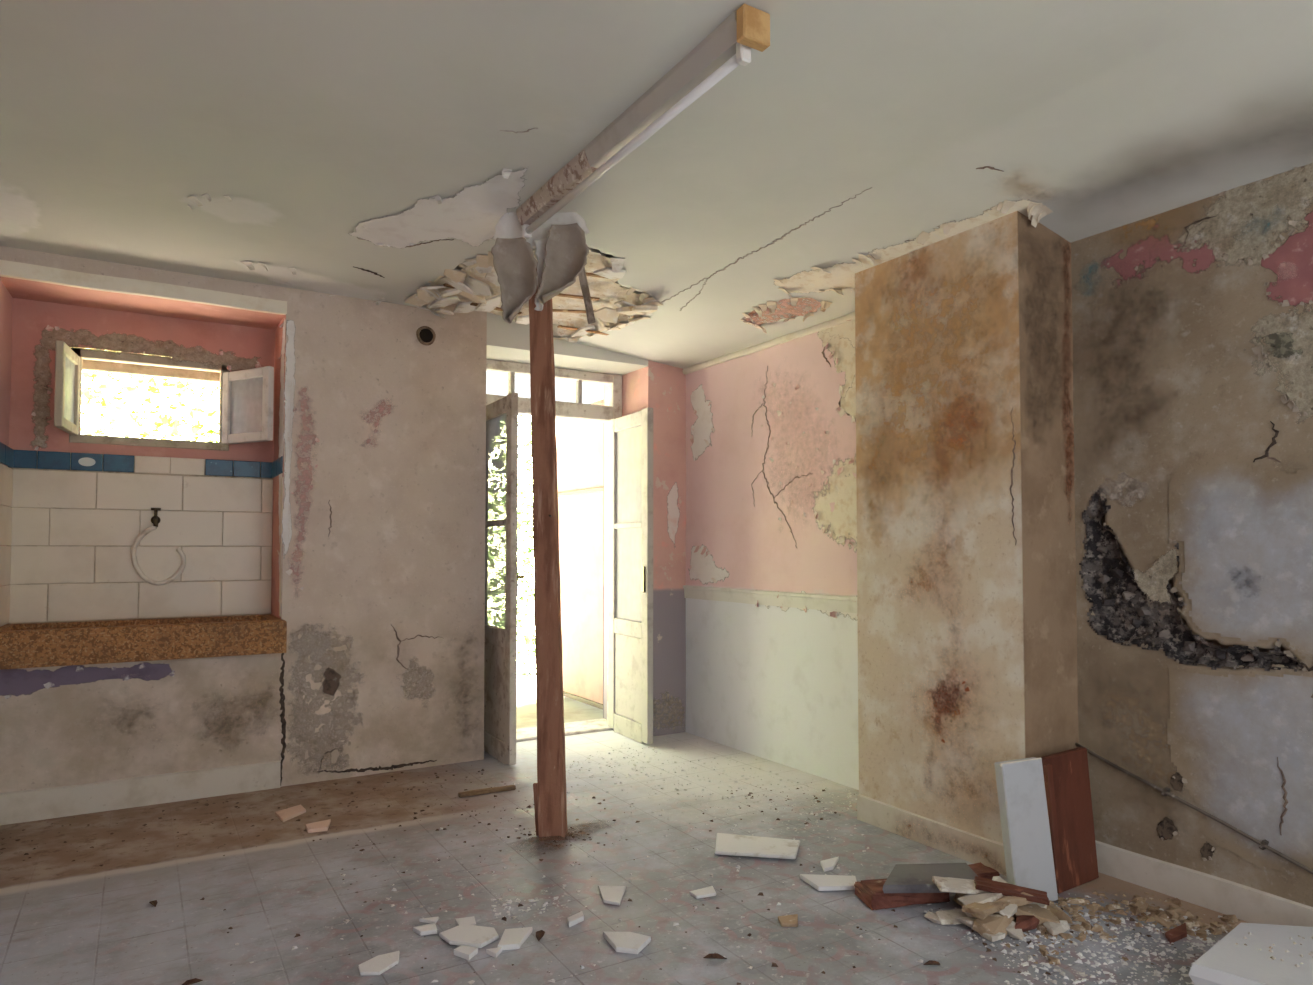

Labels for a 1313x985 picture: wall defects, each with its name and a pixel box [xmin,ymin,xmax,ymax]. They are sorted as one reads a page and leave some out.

peeling [0,176,44,242]
peeling [349,168,529,319]
flaking render [552,248,663,343]
peeling [740,199,1053,334]
peeling [1177,163,1313,422]
peeling [31,325,261,451]
peeling [818,320,856,423]
water stain [868,274,996,485]
crack [751,366,813,548]
flaking render [790,456,857,552]
flaking render [1079,474,1308,672]
peeling [0,662,175,699]